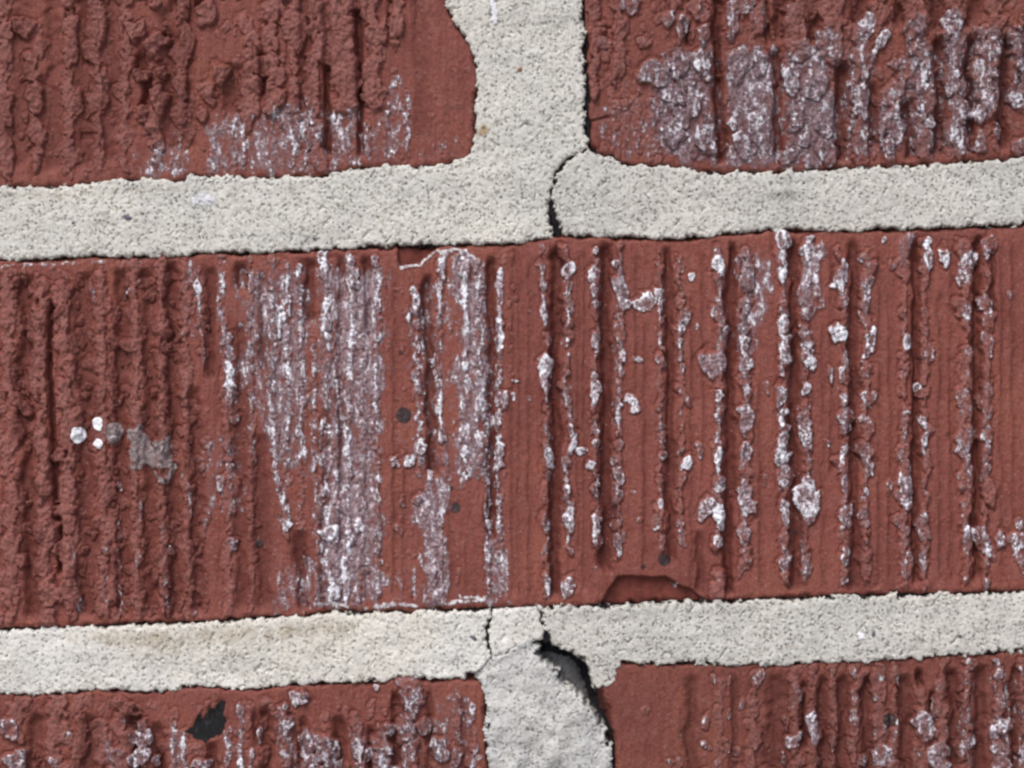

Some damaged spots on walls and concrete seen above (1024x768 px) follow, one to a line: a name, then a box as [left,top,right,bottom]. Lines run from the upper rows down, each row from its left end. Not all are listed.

damp [205,76,412,177]
crack [227,0,1013,256]
damp [638,0,1024,173]
damp [217,246,519,615]
damp [537,340,622,557]
damp [562,246,667,444]
damp [660,229,877,579]
damp [892,233,994,286]
crack [859,590,935,598]
damp [106,700,263,768]
damp [278,686,478,768]
crack [533,595,832,767]